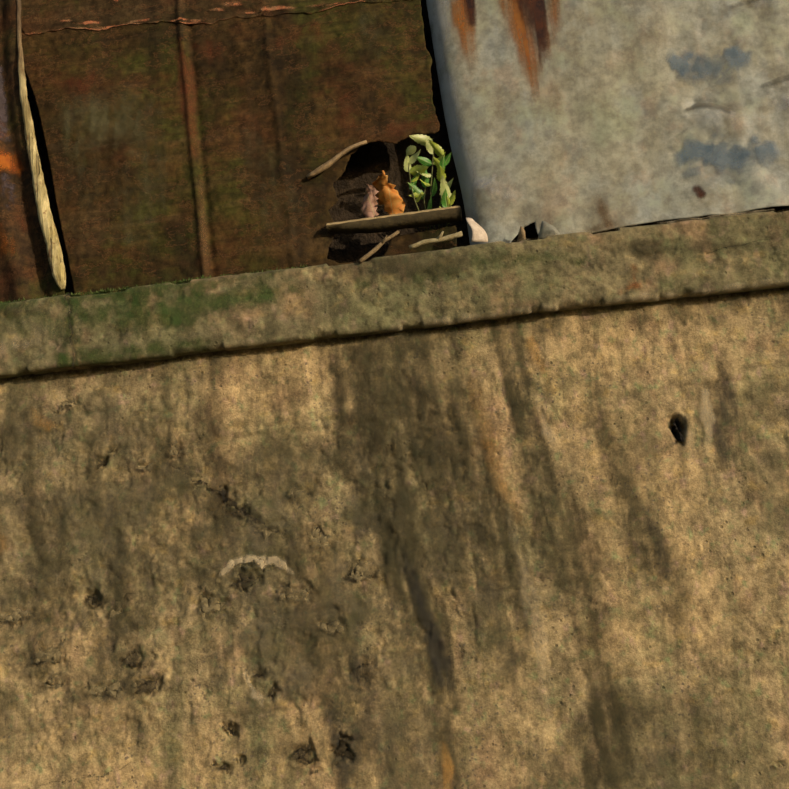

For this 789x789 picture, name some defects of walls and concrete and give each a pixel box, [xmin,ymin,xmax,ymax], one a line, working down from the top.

rust [453,0,475,51]
rust [502,0,559,83]
rust [0,153,22,173]
crack [175,467,277,533]
water stain [379,512,453,703]